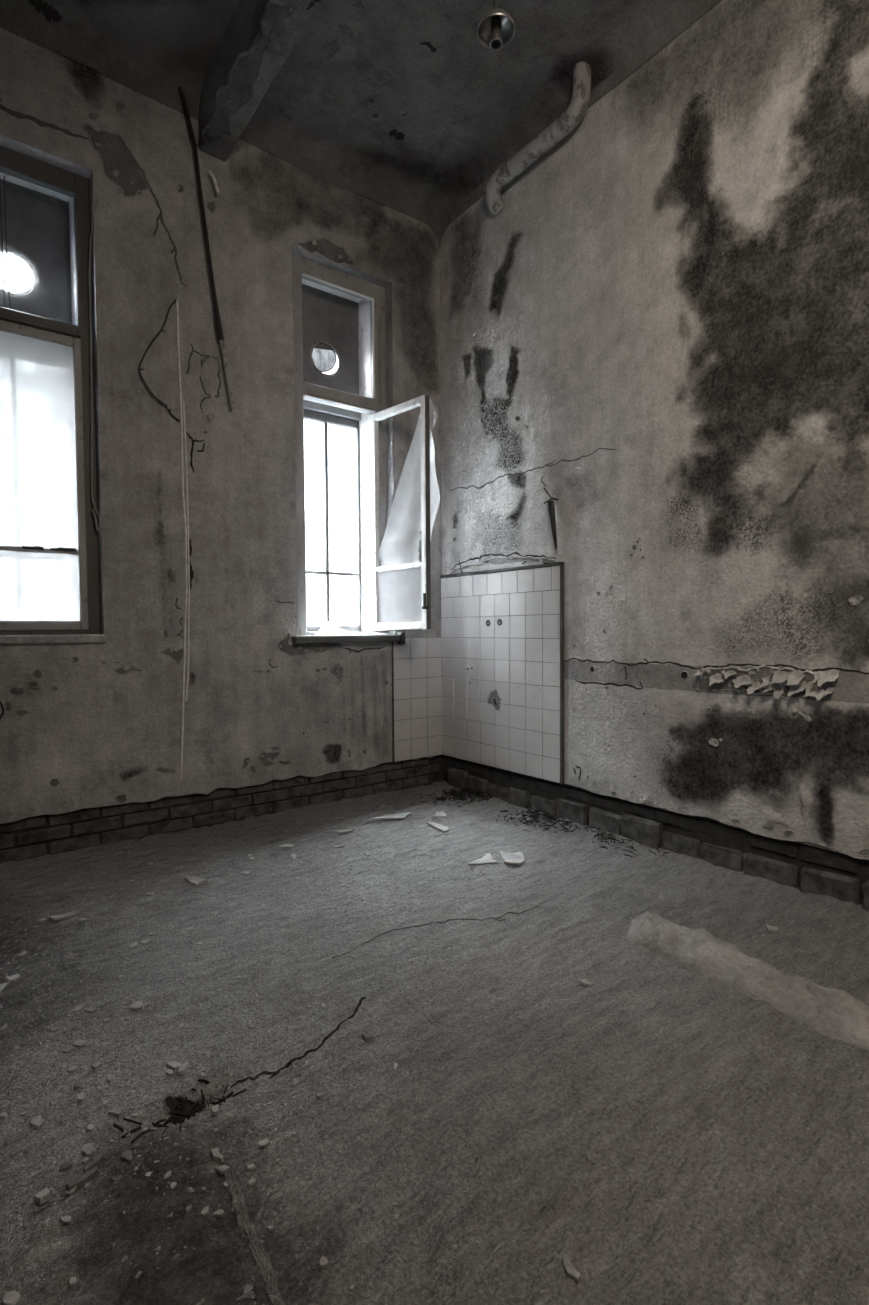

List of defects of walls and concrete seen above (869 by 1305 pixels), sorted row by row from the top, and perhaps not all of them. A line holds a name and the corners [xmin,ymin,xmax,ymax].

crack [0,98,93,140]
peeling [81,112,150,200]
damp [477,234,520,314]
damp [629,0,869,663]
crack [186,344,221,473]
damp [464,347,527,557]
crack [449,448,616,491]
peeling [680,664,840,722]
damp [657,707,869,844]
crack [230,996,366,1088]